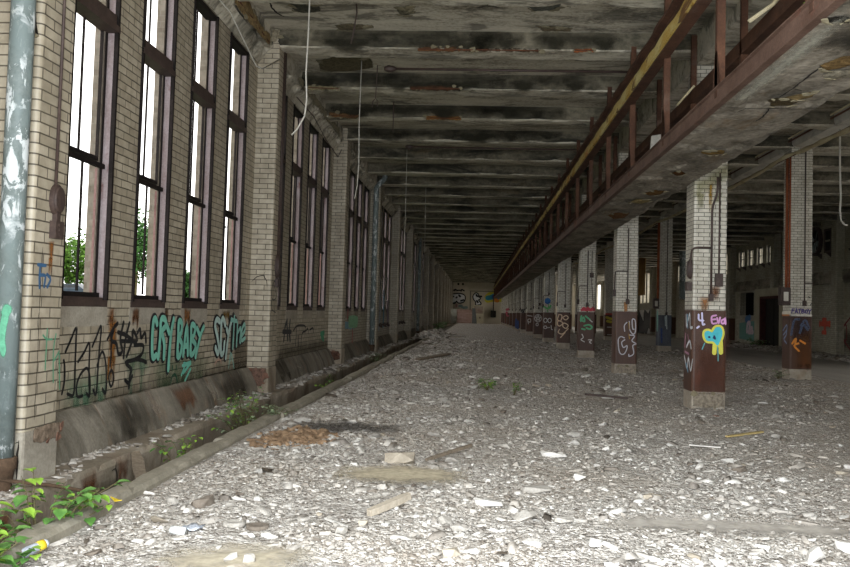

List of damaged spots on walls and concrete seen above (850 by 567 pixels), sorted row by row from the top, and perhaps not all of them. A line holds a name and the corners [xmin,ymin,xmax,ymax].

damp [737,30,826,100]
spalling [818,56,850,80]